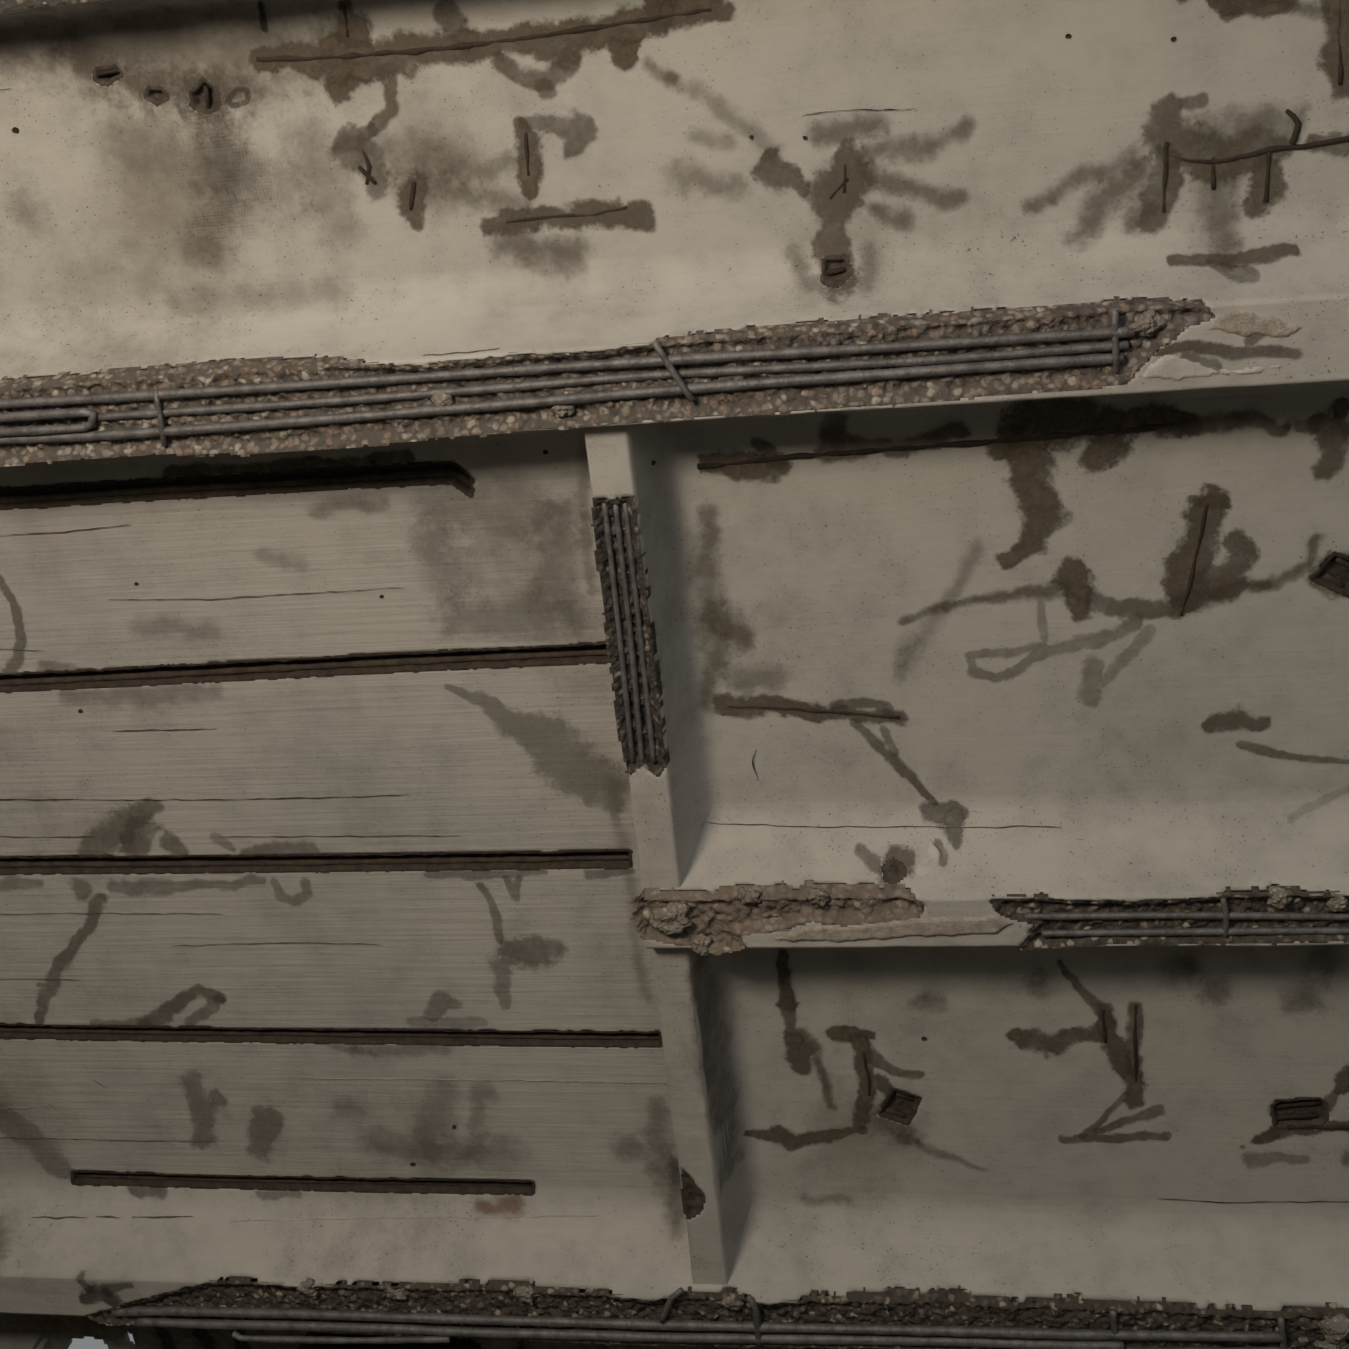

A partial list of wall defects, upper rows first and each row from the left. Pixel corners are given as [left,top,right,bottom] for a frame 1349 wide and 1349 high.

spalling [0,0,101,12]
water stain [368,73,398,134]
crack [806,107,916,115]
spalling [0,296,1302,467]
spalling [591,495,670,777]
crack [0,793,408,801]
crack [0,833,91,841]
crack [229,832,441,840]
crack [701,822,1061,863]
spalling [631,841,1349,956]
crack [1,913,378,946]
spalling [86,1276,1349,1349]